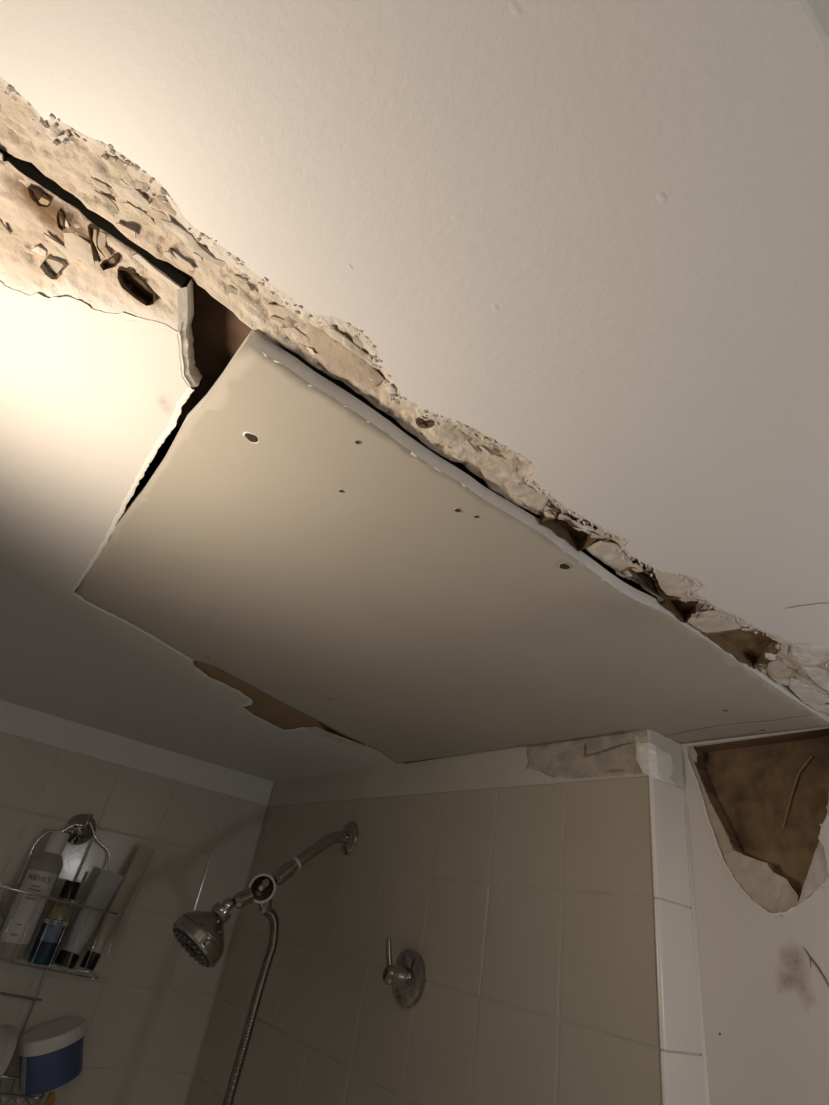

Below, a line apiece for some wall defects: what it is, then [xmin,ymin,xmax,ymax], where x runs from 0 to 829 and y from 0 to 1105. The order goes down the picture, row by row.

flaking render [0,77,829,714]
flaking render [526,730,675,785]
spalling [688,728,829,917]